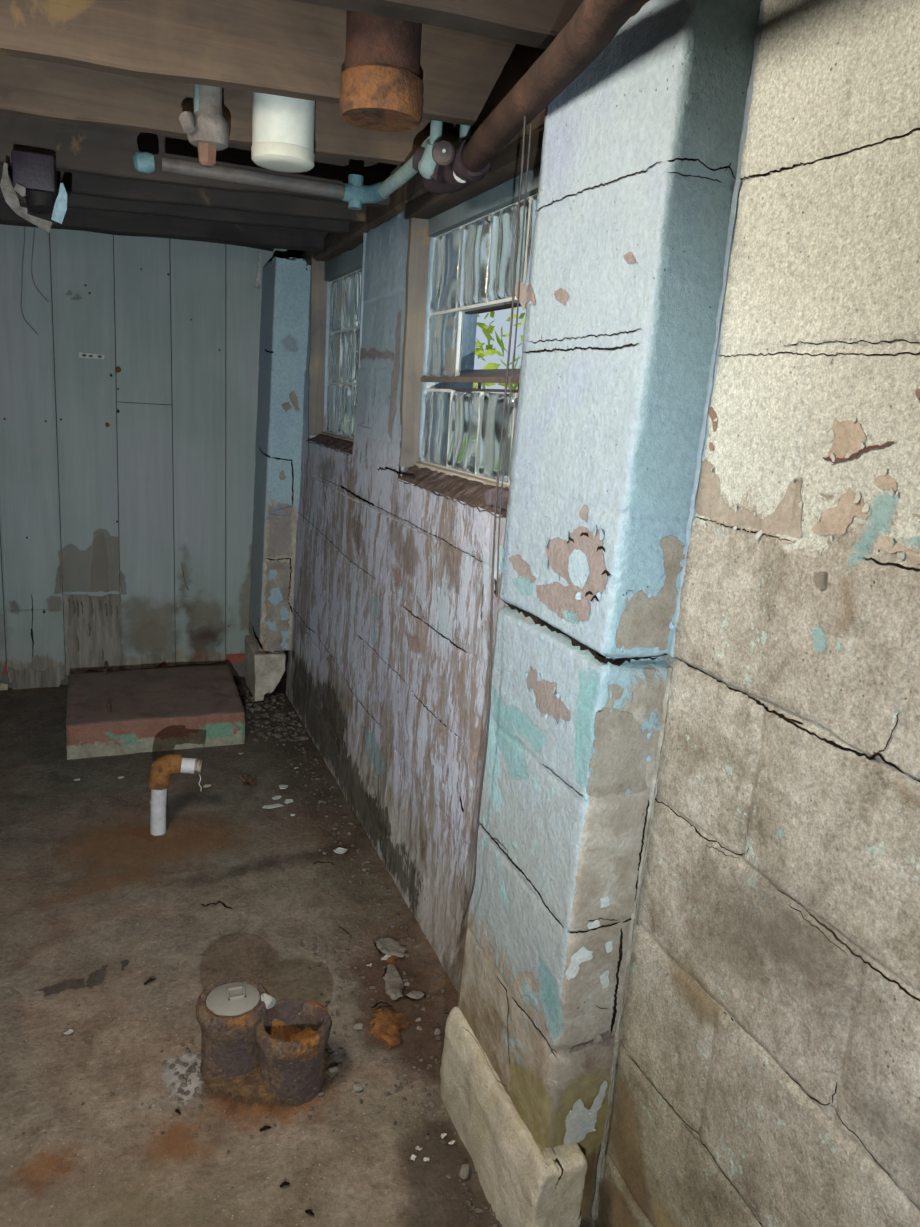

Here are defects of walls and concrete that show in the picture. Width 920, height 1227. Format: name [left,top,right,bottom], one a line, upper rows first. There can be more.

crack [535,127,920,211]
crack [523,329,639,353]
crack [720,339,920,363]
peeling [695,407,871,544]
peeling [823,417,894,465]
peeling [874,467,899,497]
damp [47,529,225,653]
peeling [509,505,611,622]
crack [324,479,920,782]
corrosion [78,825,226,888]
spalling [569,1031,611,1053]
crack [480,799,763,1227]